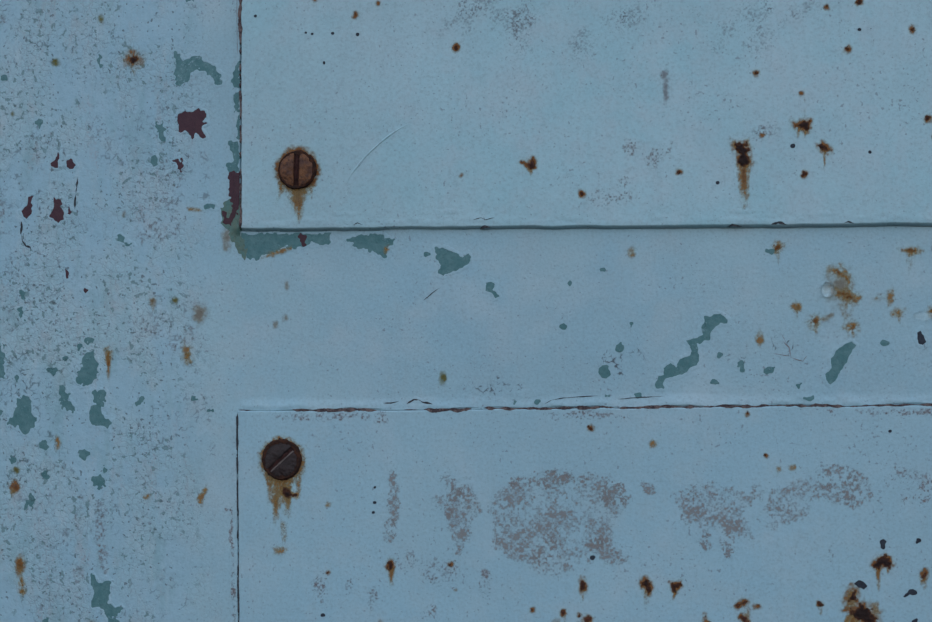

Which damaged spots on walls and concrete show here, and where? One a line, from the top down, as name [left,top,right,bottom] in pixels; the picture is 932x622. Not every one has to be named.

peeling [148,104,211,175]
peeling [170,46,334,265]
rust [275,147,320,219]
rust [731,141,752,199]
peeling [424,243,473,280]
rust [829,268,862,305]
peeling [651,310,732,392]
peeling [821,338,859,388]
peeling [0,392,40,438]
rust [259,436,305,525]
rust [871,554,894,587]
rust [842,583,880,622]